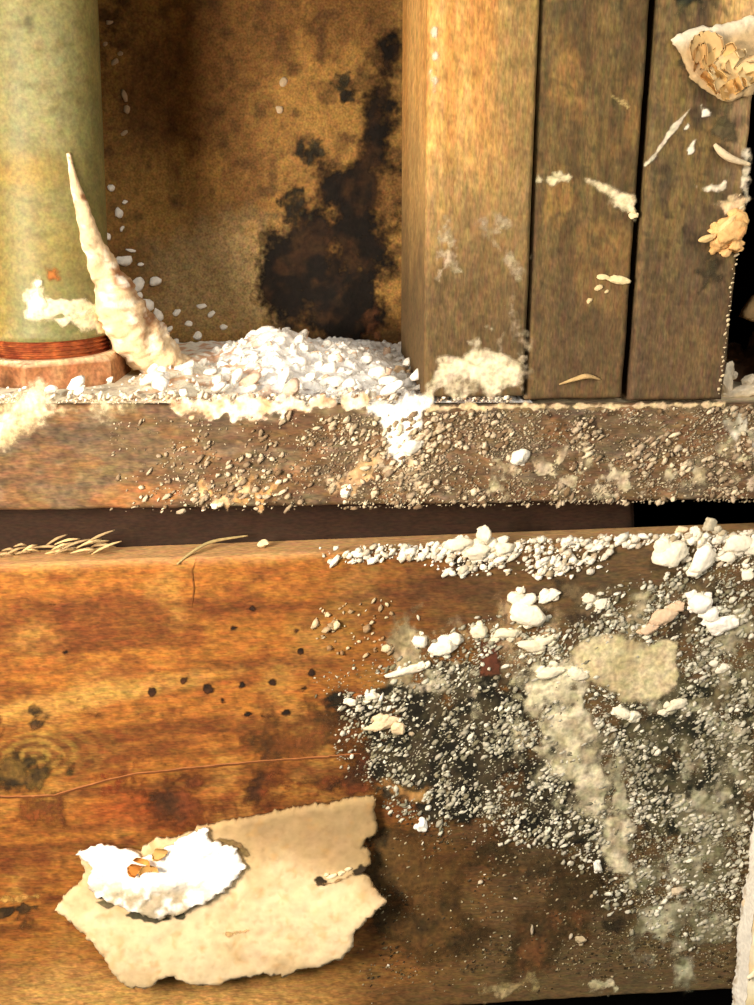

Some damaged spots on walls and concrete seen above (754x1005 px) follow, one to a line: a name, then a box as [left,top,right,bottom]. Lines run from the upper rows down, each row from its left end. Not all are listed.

water stain [256,31,402,341]
water stain [131,406,754,511]
water stain [28,706,47,730]
water stain [0,752,66,825]
crack [0,753,362,799]
water stain [145,774,224,831]
water stain [235,554,754,1000]